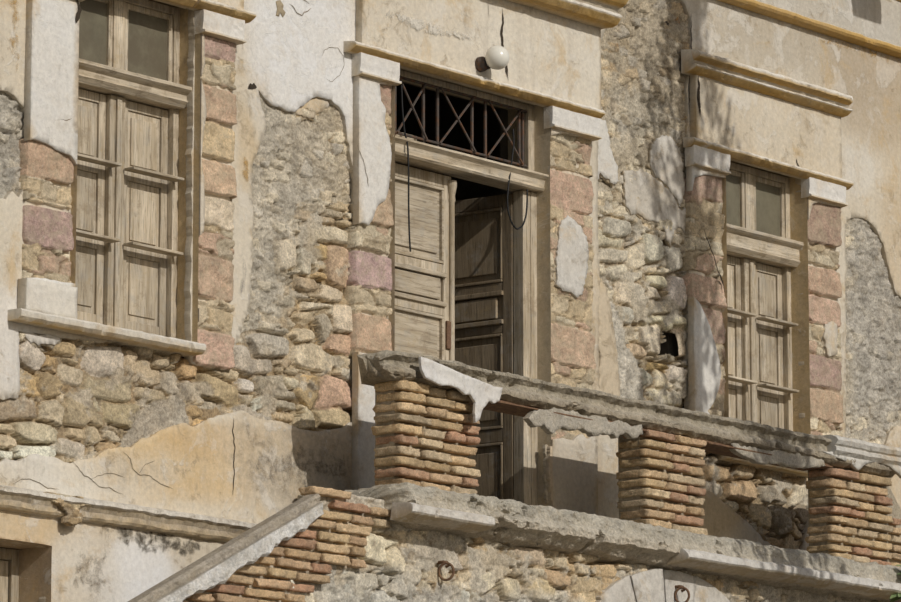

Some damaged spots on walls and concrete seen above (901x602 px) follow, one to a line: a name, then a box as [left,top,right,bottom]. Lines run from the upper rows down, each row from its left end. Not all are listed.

crack [501,8,509,80]
spalling [0,35,394,463]
spalling [550,0,727,417]
spalling [808,203,901,445]
flaking render [419,357,502,423]
crack [72,451,173,494]
crack [230,423,238,490]
spalling [696,452,808,549]